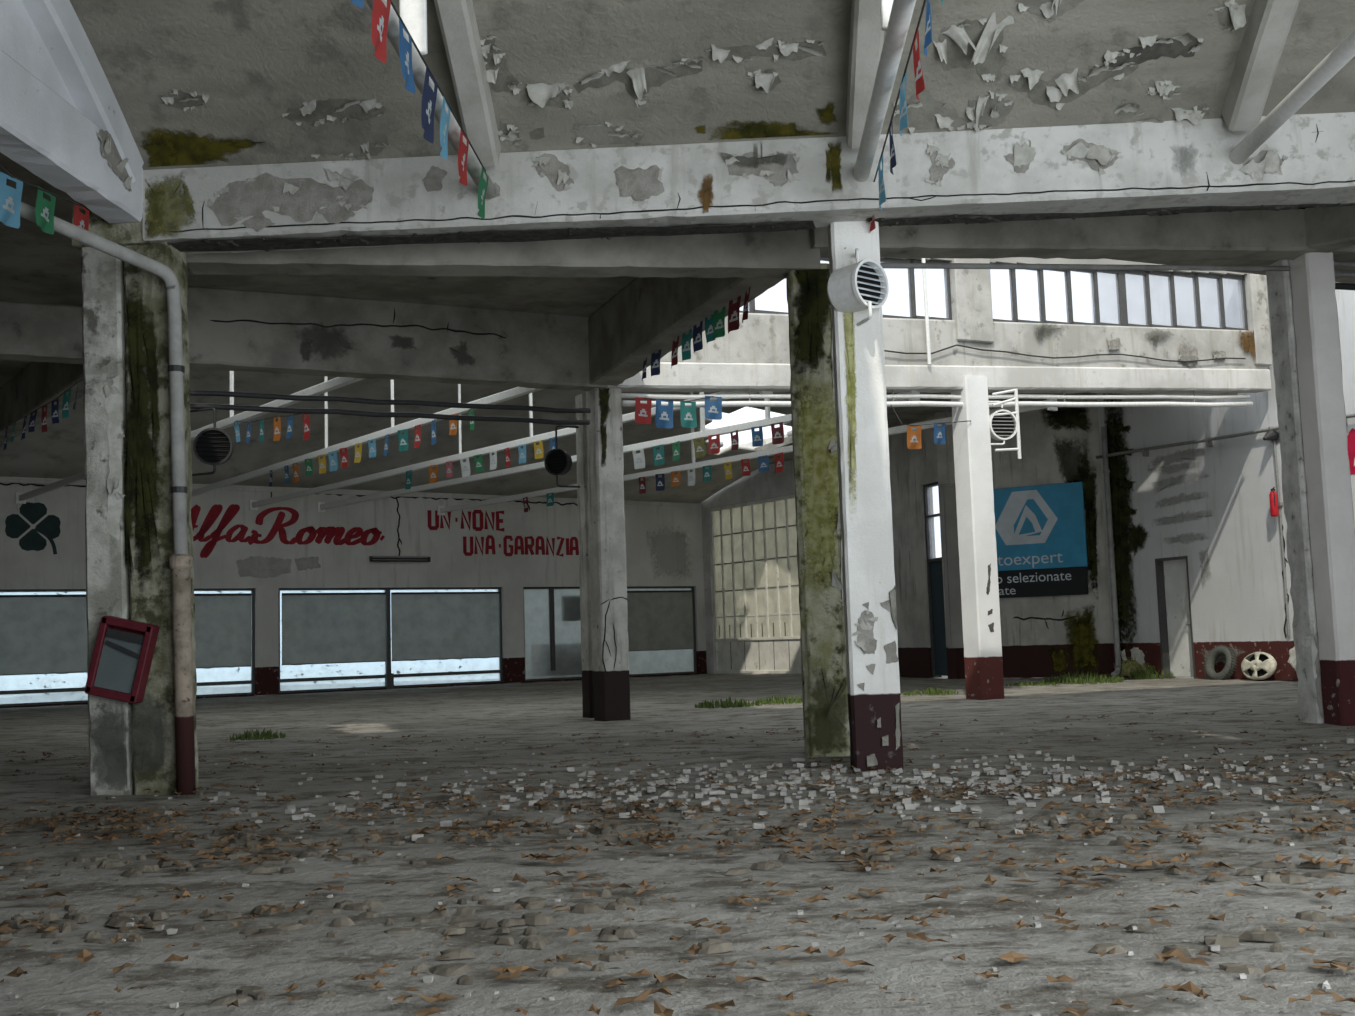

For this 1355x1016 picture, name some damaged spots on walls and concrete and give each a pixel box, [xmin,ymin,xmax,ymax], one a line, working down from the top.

damp [143,138,181,167]
damp [225,140,265,148]
spalling [167,98,816,252]
peeling [480,35,826,148]
peeling [891,0,1210,187]
damp [793,269,831,374]
damp [123,300,160,573]
peeling [852,586,898,691]
spalling [866,702,901,767]